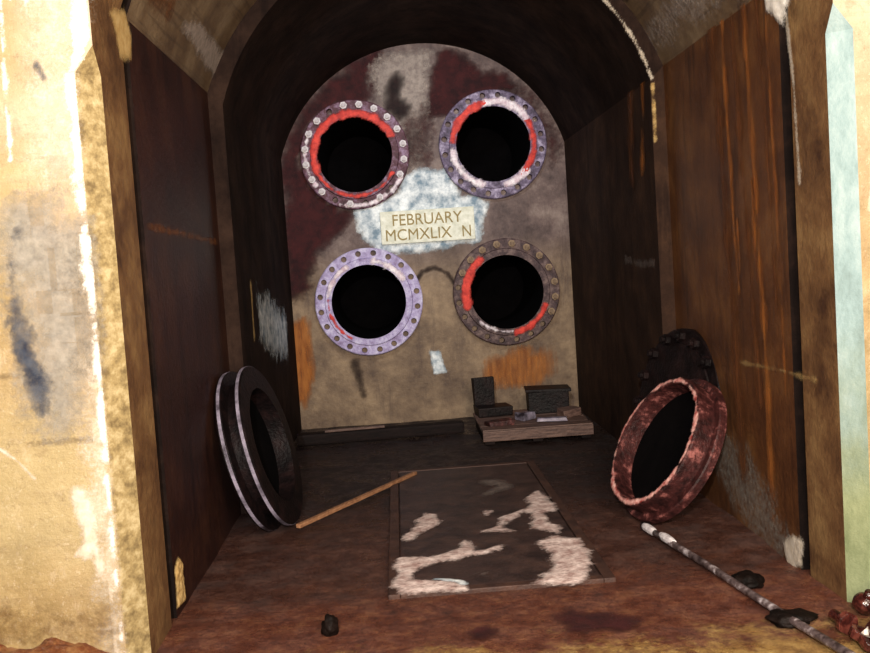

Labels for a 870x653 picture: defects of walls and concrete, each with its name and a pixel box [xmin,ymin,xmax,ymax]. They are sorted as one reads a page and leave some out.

water stain [5,107,13,162]
water stain [7,201,94,428]
peeling [35,0,90,213]
peeling [79,225,96,318]
spalling [111,10,131,59]
spalling [184,23,223,74]
water stain [281,49,562,298]
peeling [74,325,118,601]